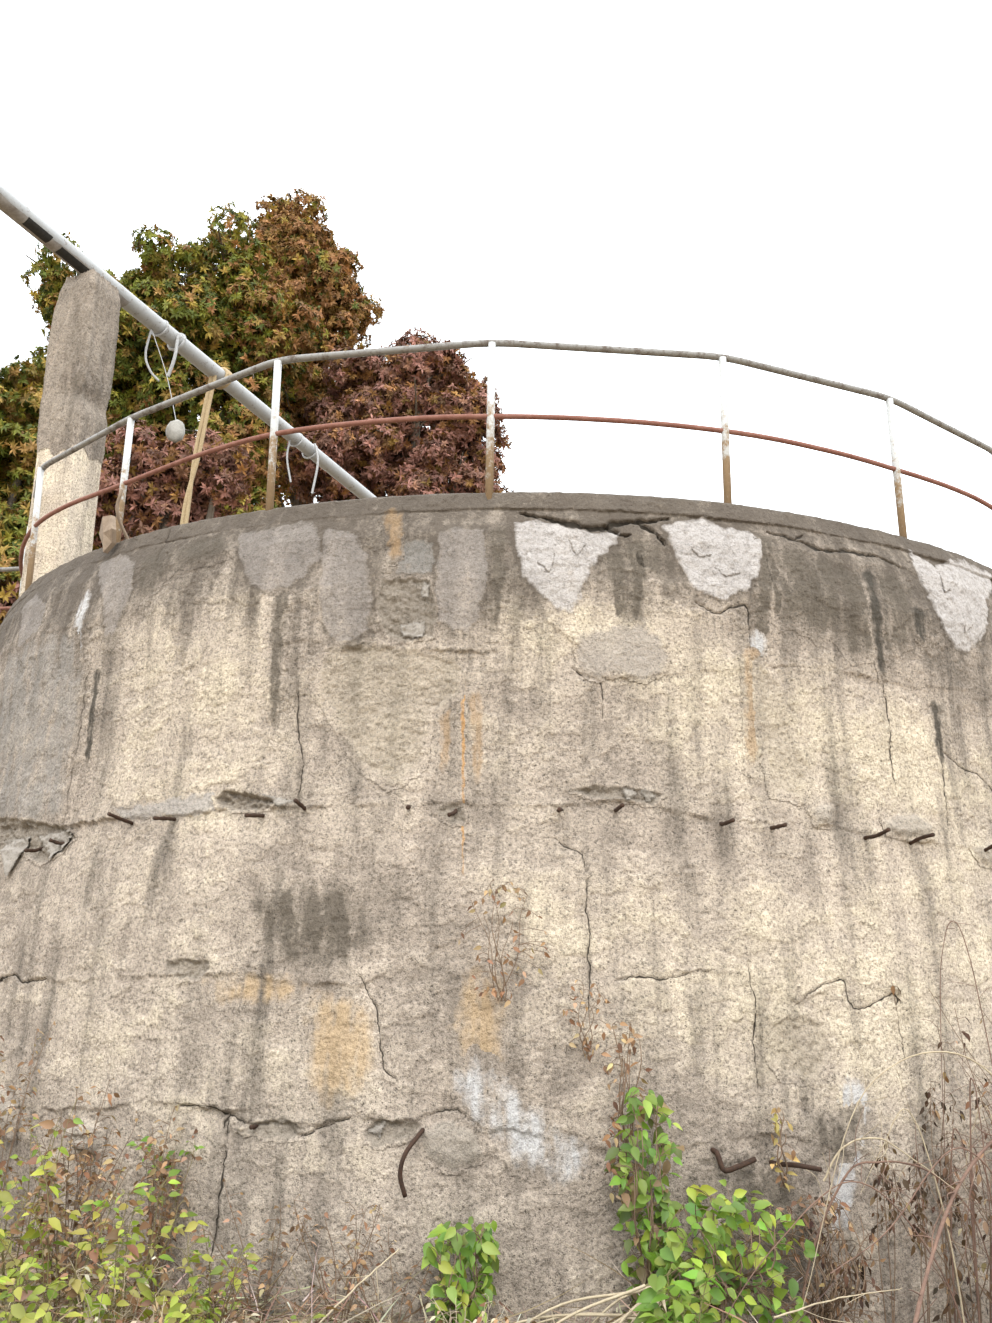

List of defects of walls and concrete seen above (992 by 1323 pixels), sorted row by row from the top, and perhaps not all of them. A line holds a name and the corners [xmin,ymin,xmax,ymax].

peeling [513,519,621,614]
peeling [661,515,763,602]
peeling [908,549,992,653]
corrosion [435,674,487,809]
damp [926,696,947,770]
crack [939,751,992,827]
damp [241,867,383,981]
crack [362,980,397,1081]
crack [803,979,906,1063]